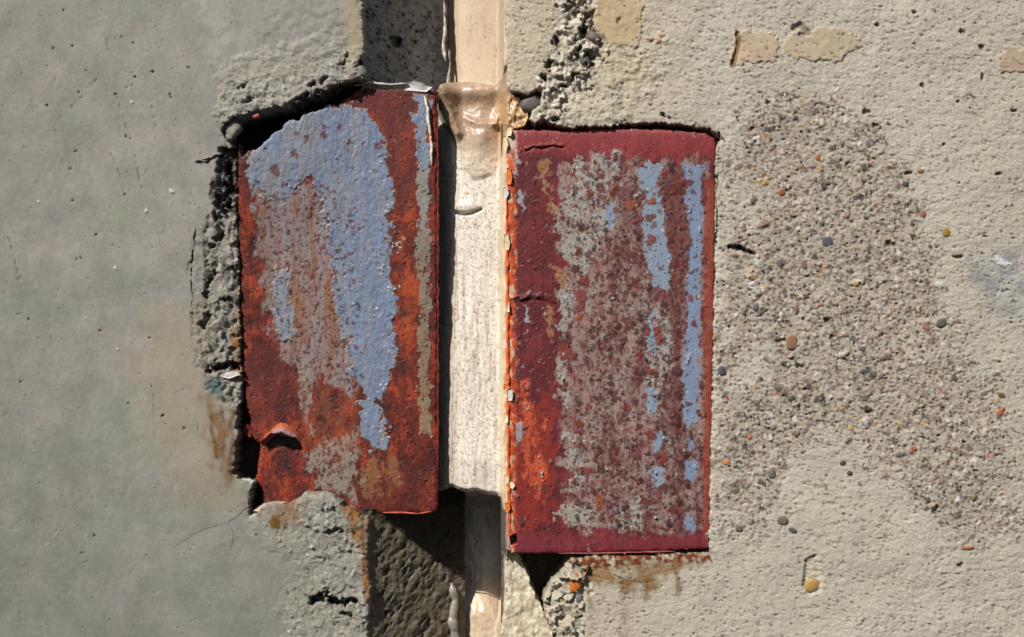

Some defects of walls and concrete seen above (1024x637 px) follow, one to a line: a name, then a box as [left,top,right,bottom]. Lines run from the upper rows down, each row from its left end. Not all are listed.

spalling [519,0,684,130]
spalling [188,27,433,408]
rust [382,108,440,514]
spalling [708,26,1024,555]
rust [262,423,302,448]
spalling [242,490,388,637]
rust [559,551,710,593]